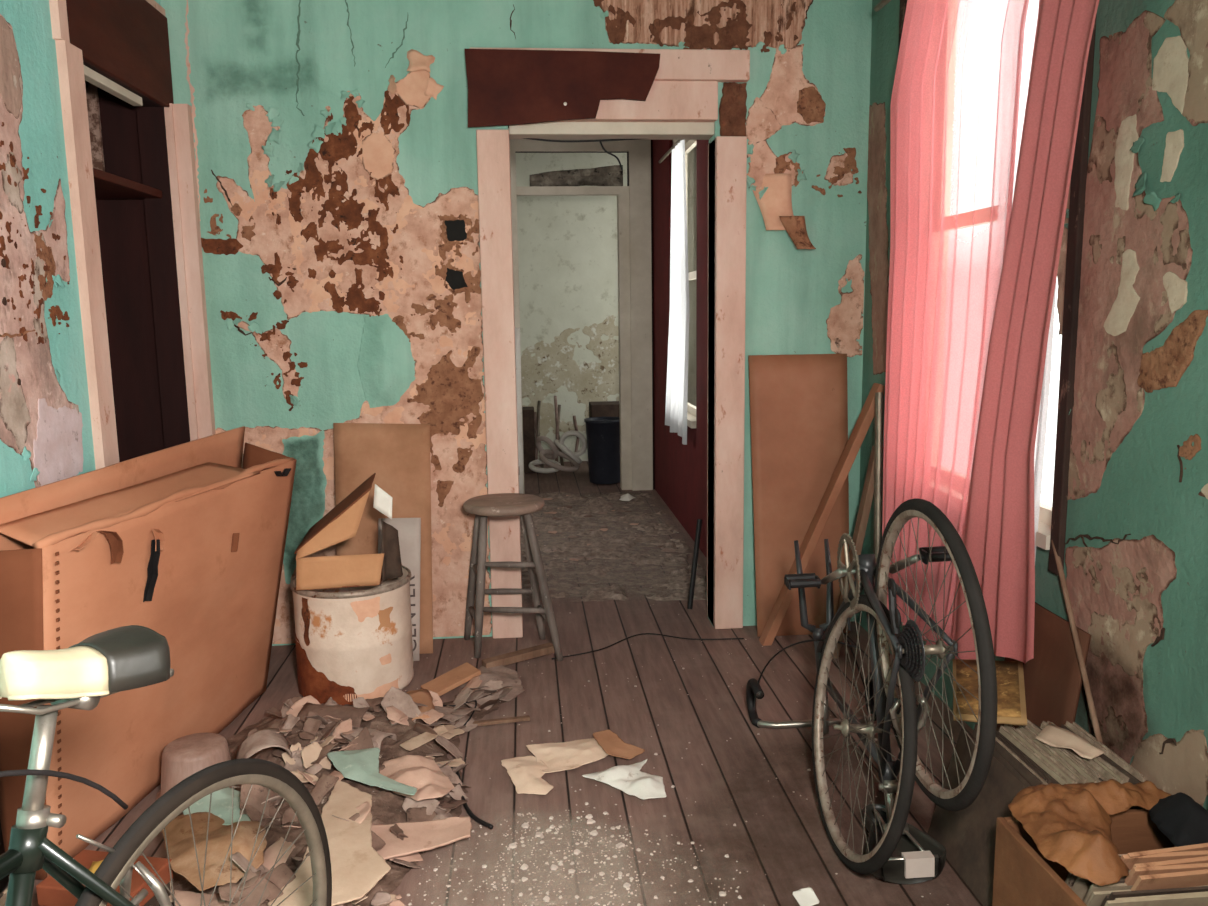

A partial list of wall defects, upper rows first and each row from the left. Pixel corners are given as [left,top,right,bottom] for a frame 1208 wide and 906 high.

peeling [0,94,83,487]
crack [295,0,305,116]
peeling [201,49,492,644]
crack [345,0,356,67]
crack [385,16,408,68]
peeling [521,315,619,437]
flaking render [593,0,889,375]
flaking render [1057,180,1071,335]
peeling [1068,0,1208,500]
peeling [1065,535,1208,807]